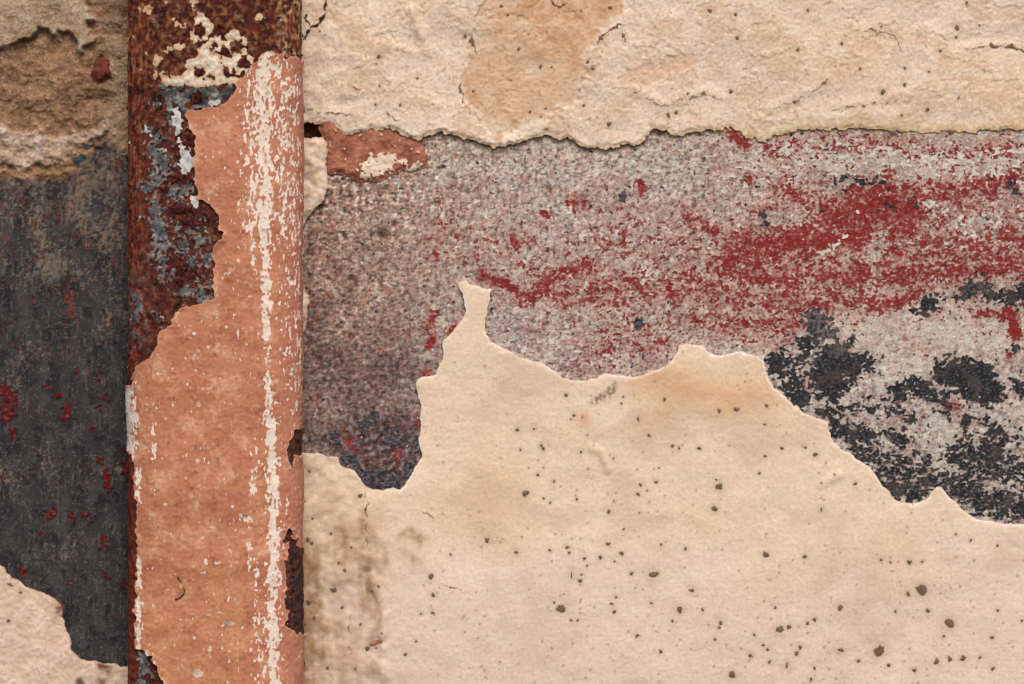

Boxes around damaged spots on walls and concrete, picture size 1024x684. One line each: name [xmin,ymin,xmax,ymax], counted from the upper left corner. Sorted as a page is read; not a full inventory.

peeling [0,0,174,670]
corrosion [126,0,303,386]
corrosion [282,529,305,635]
corrosion [287,429,302,469]
peeling [207,0,1024,684]